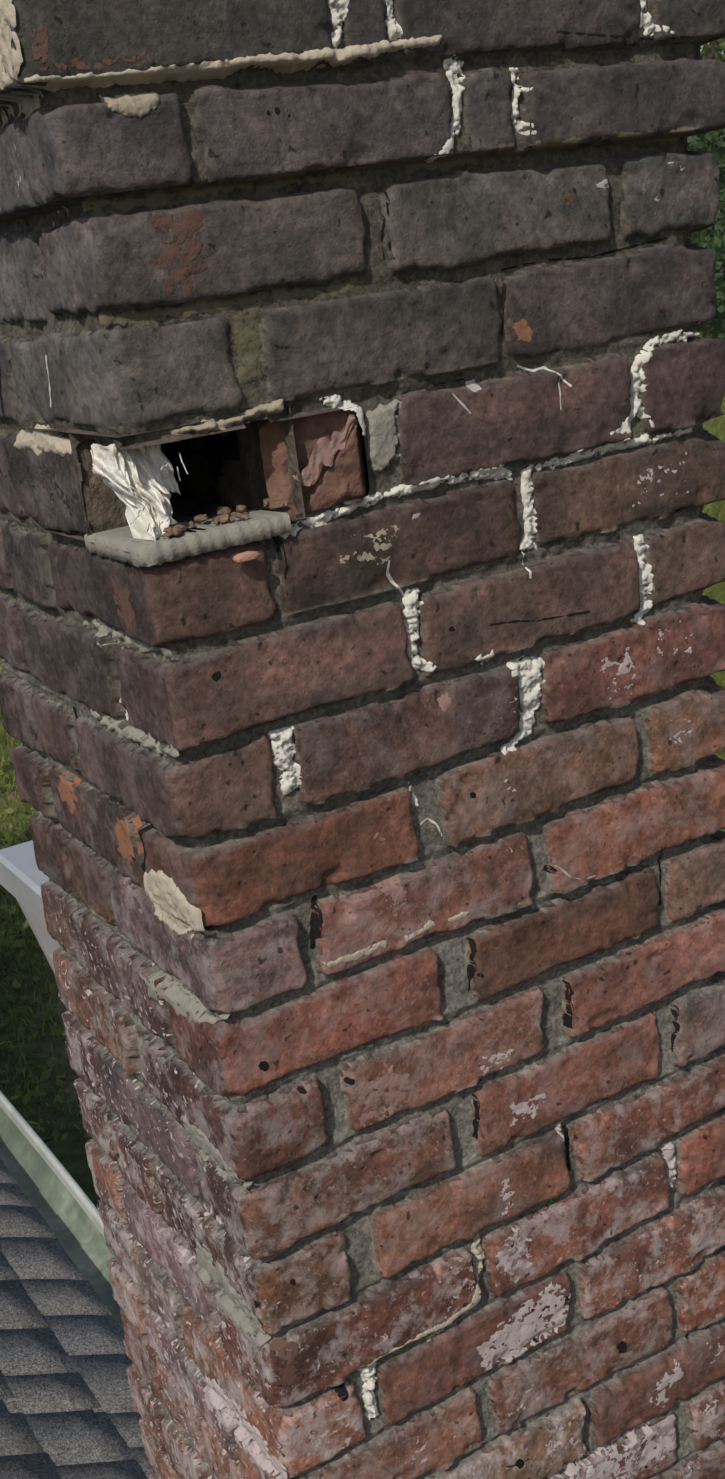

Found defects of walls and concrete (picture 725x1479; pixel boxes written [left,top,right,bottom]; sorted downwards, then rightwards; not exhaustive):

damp [465,378,481,392]
spalling [22,406,367,553]
damp [632,452,689,507]
peeling [232,551,260,563]
damp [657,620,693,661]
efflorescence [600,647,636,700]
damp [436,692,452,712]